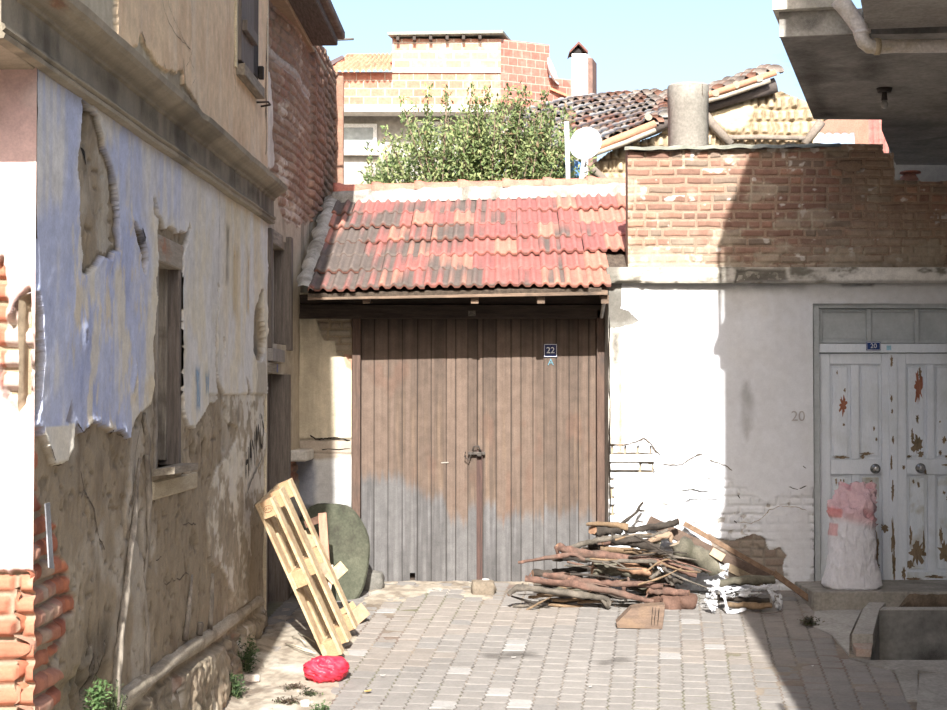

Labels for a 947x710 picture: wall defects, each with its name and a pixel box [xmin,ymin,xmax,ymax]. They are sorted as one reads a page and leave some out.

flaking render [80,0,119,34]
flaking render [133,34,199,106]
spalling [78,103,118,274]
spalling [253,304,267,403]
crack [608,318,740,522]
crack [734,466,806,524]
flaking render [708,533,786,579]